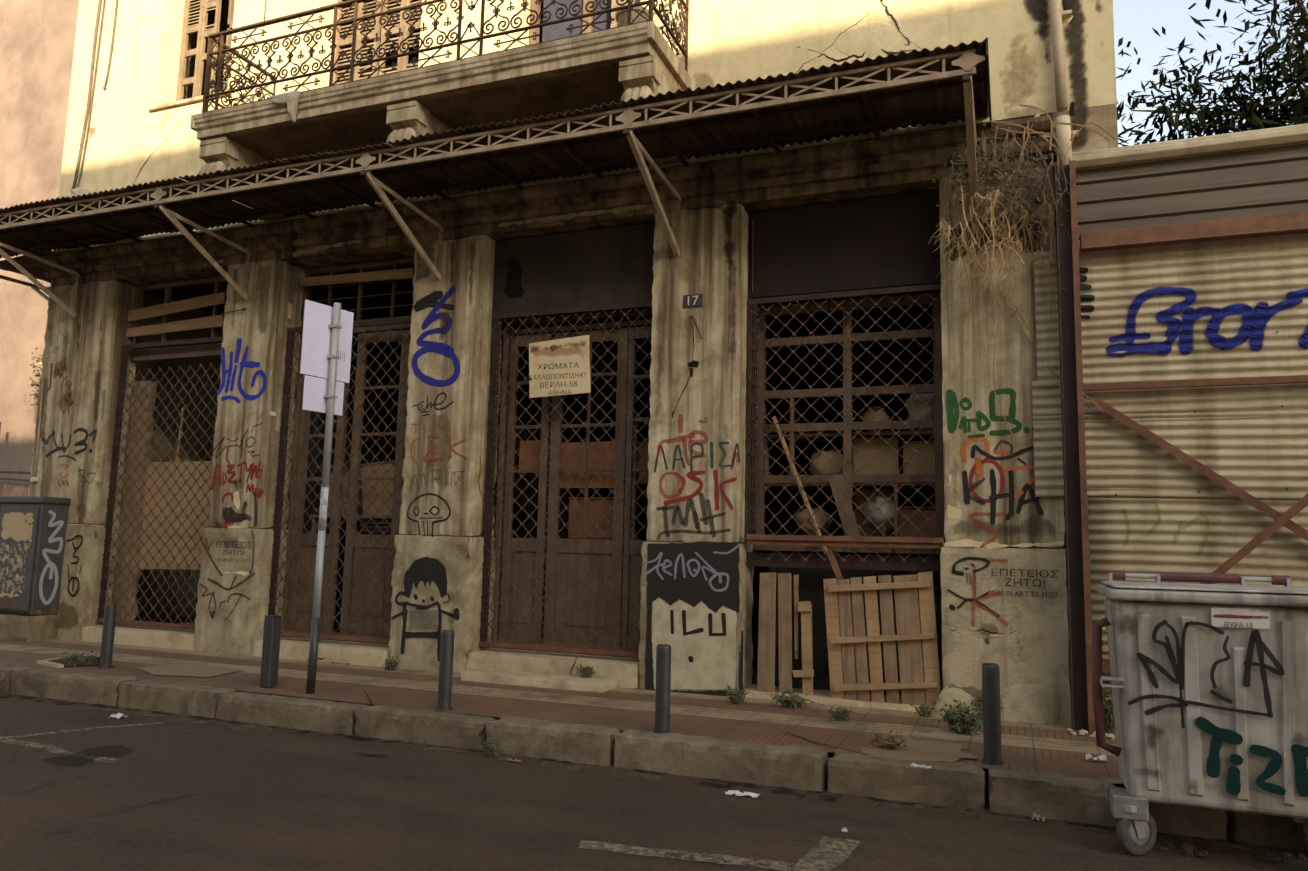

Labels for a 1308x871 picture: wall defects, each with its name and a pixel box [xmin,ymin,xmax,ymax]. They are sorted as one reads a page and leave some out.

crack [795,2,922,74]
water stain [1025,0,1100,149]